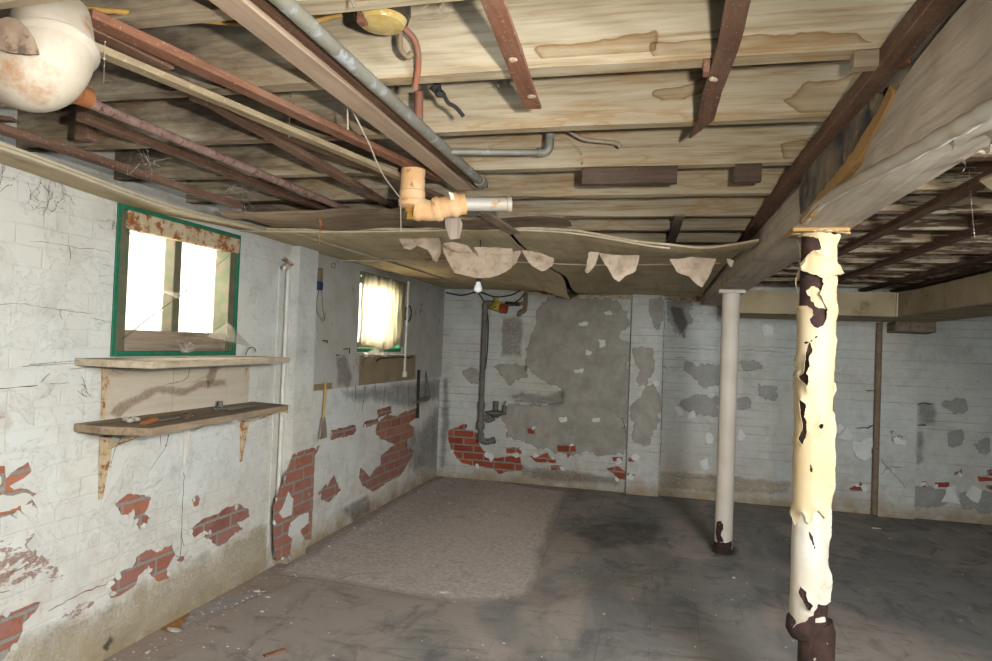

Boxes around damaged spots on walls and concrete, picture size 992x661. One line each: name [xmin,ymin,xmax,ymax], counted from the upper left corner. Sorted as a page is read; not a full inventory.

damp [535,31,718,59]
damp [742,32,872,43]
flaking render [448,296,662,482]
flaking render [674,361,720,419]
flaking render [0,462,42,518]
flaking render [115,493,151,529]
flaking render [188,504,250,546]
flaking render [272,406,417,560]
damp [0,539,62,586]
damp [15,529,265,661]
flaking render [105,545,189,598]
flaking render [0,602,40,661]